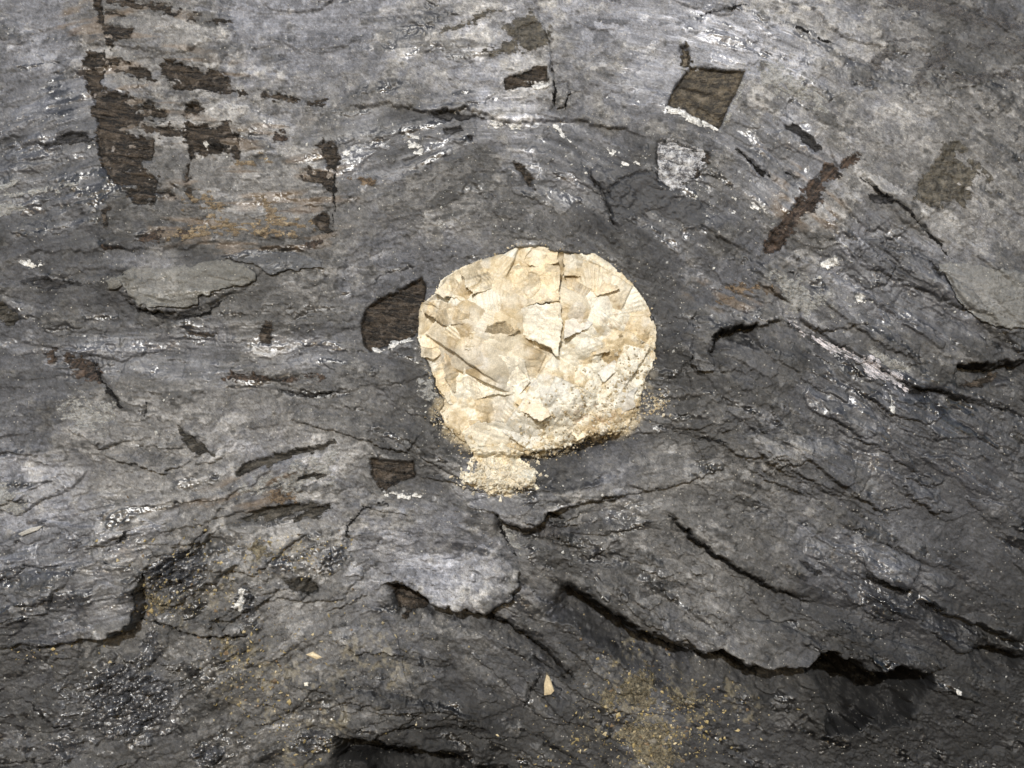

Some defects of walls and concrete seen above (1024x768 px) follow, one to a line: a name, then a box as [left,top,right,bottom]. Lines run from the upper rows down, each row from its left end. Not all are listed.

spalling [35,0,328,206]
spalling [504,65,549,90]
spalling [668,41,745,128]
corrosion [760,151,862,257]
spalling [361,277,426,351]
crack [710,324,759,357]
spalling [370,459,416,491]
crack [970,639,1024,660]